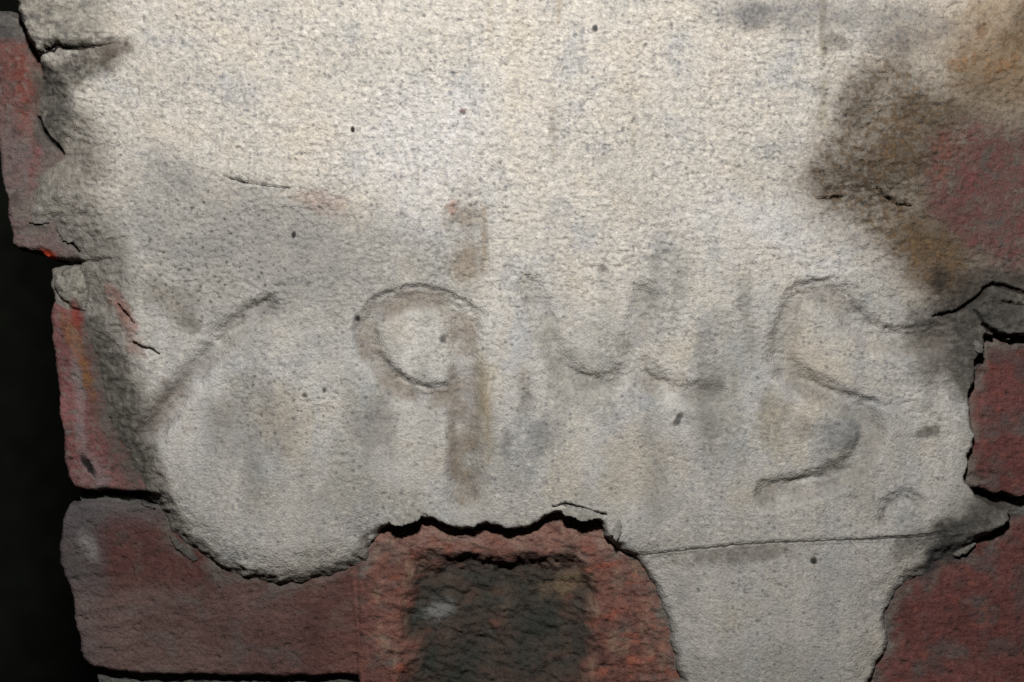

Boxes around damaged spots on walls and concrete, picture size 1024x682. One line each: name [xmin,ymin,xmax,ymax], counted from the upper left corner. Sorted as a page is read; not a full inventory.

flaking render [0,26,81,264]
damp [817,66,1018,331]
crack [932,282,1024,338]
flaking render [51,301,679,682]
crack [623,520,976,556]
flaking render [875,512,1024,682]
flaking render [963,336,1024,499]